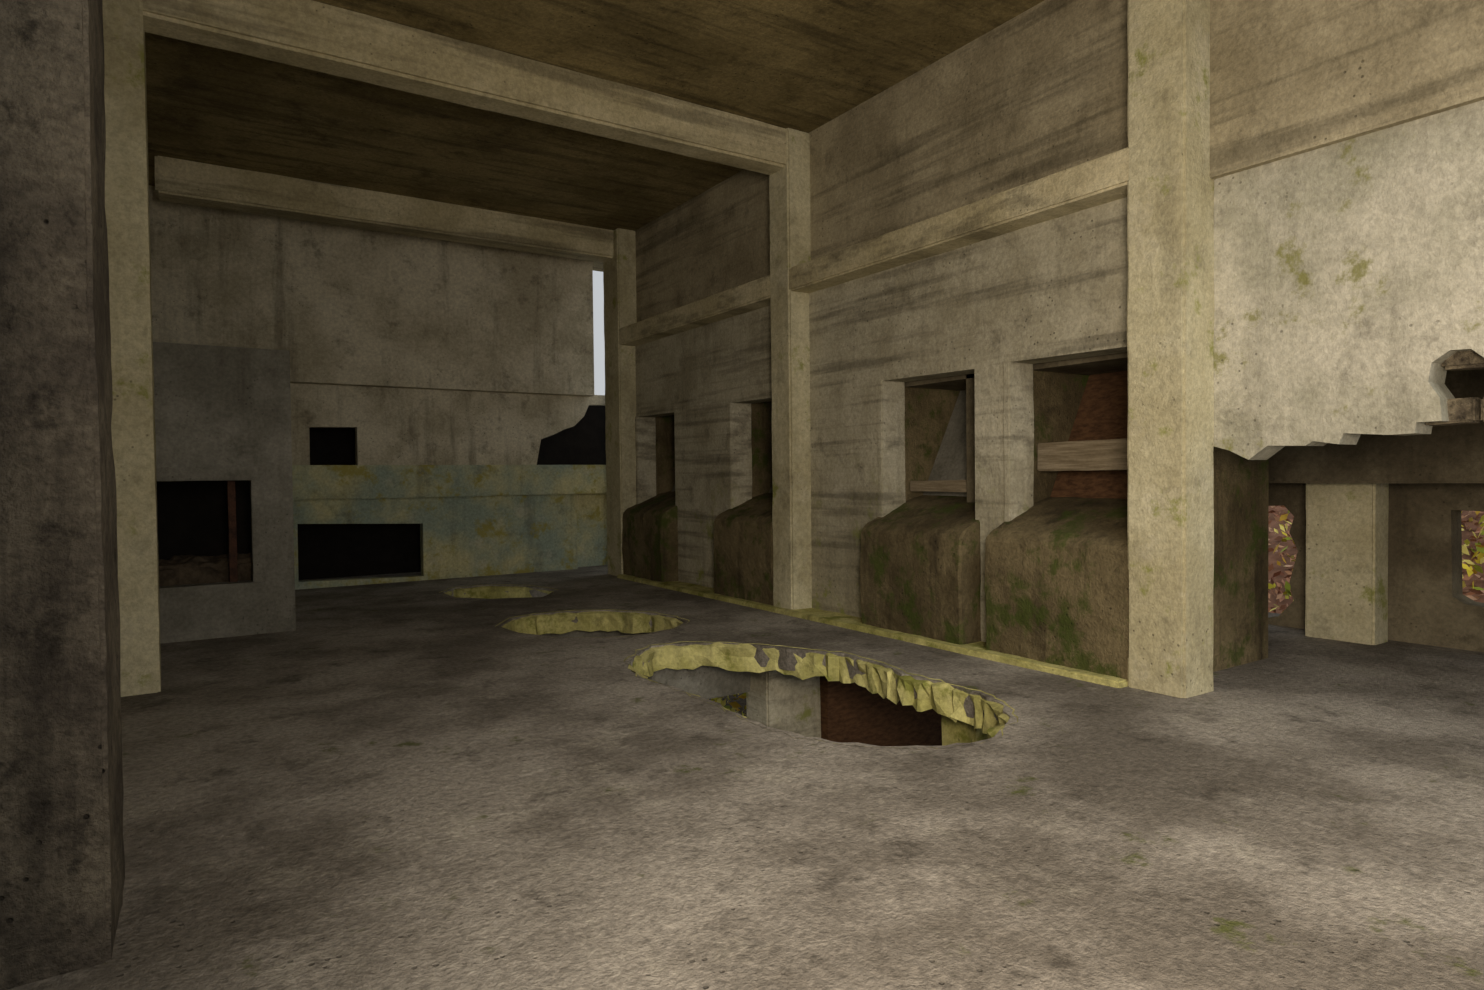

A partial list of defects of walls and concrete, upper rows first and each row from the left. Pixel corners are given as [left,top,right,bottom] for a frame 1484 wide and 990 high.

spalling [439,584,1018,747]